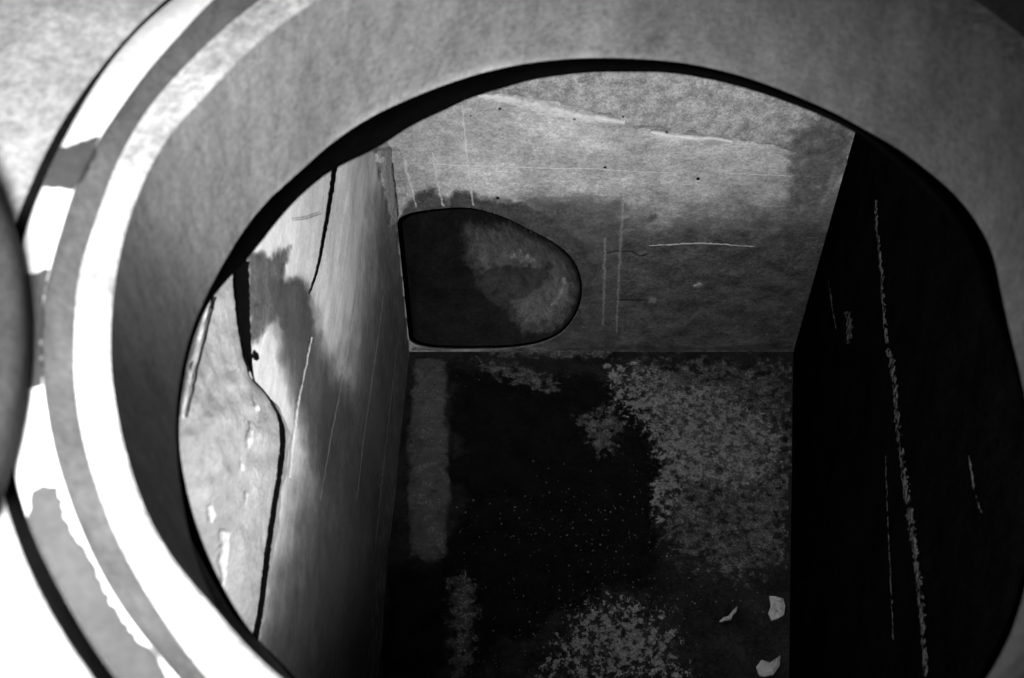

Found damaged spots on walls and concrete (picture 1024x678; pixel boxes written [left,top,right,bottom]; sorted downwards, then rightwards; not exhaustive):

crack [292,168,337,295]
peeling [183,308,209,418]
water stain [248,189,831,678]
peeling [219,531,230,587]